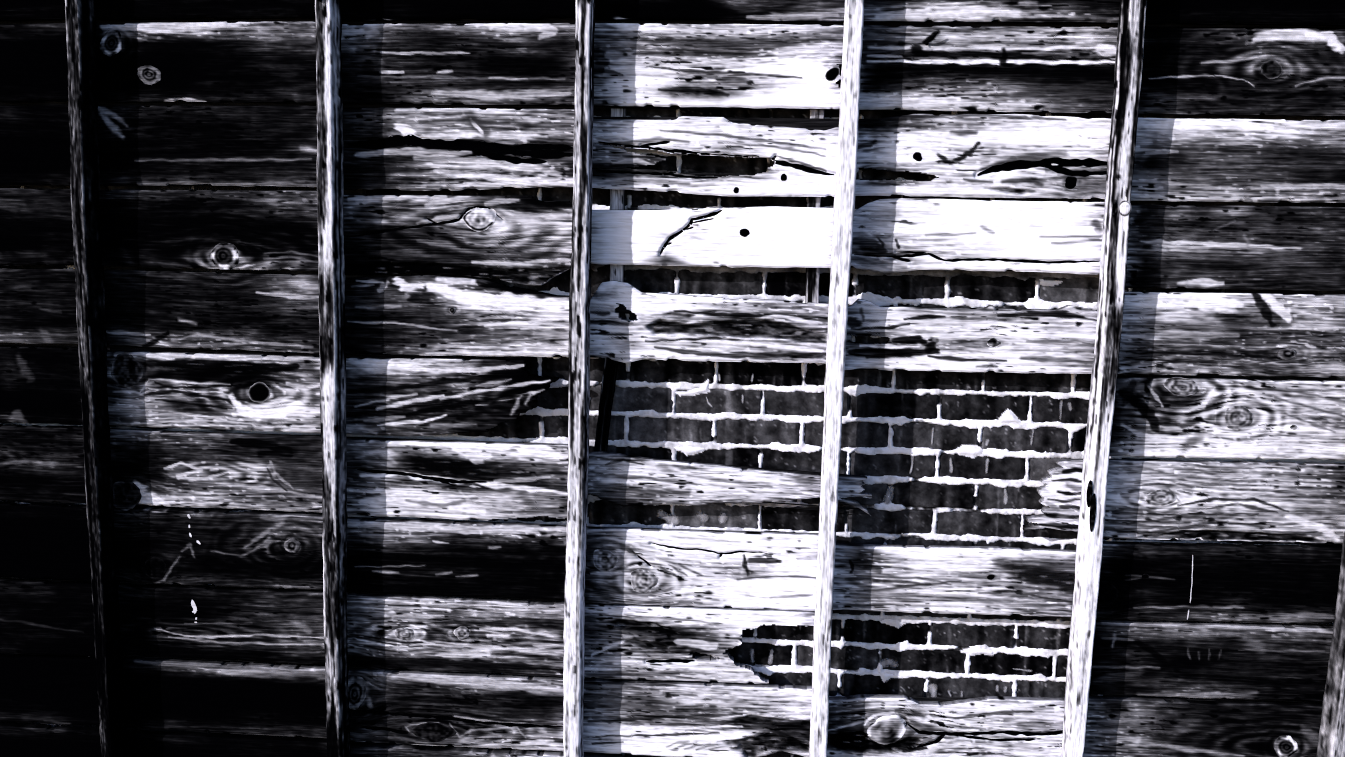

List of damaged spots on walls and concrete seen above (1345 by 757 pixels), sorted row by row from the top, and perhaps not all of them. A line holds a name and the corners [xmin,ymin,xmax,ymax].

crack [346,134,834,255]